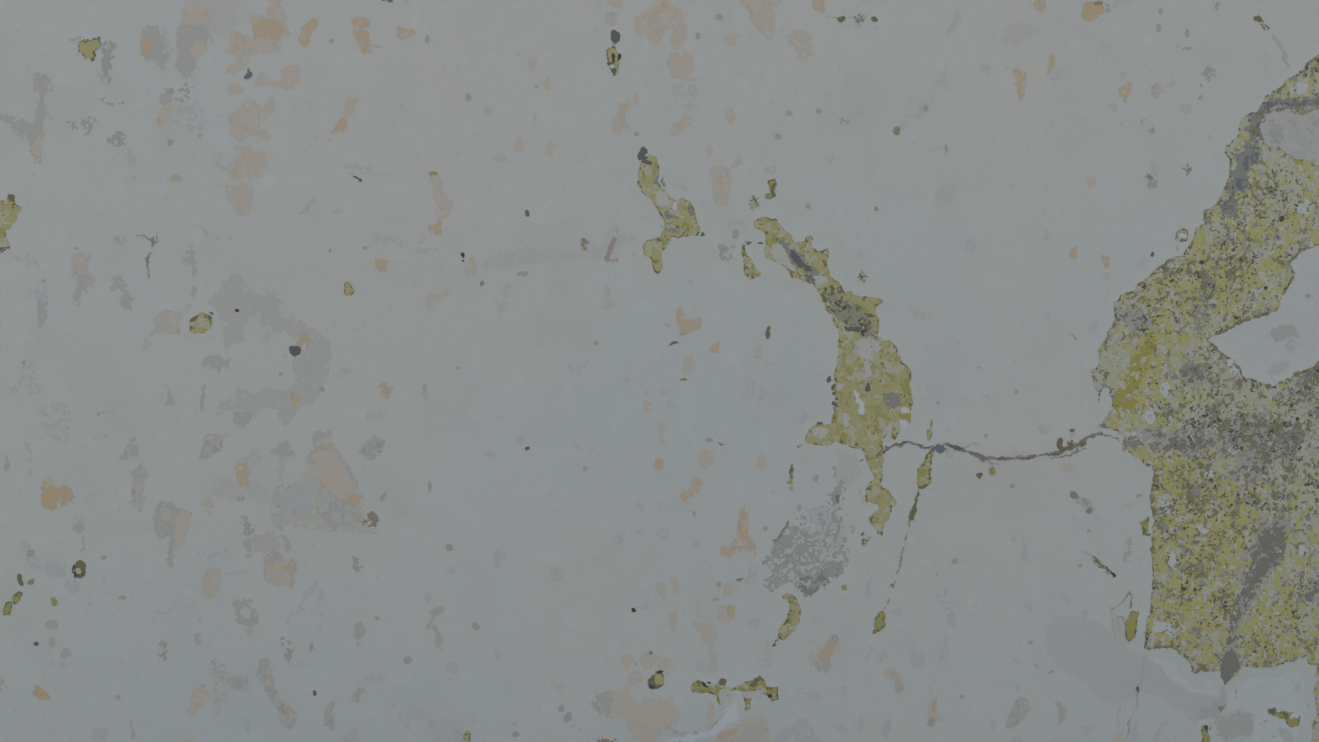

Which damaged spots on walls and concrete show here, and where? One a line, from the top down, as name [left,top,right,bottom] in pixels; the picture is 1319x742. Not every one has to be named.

peeling [0,183,30,265]
peeling [629,145,742,285]
peeling [732,179,941,546]
crack [860,432,1137,465]
peeling [1057,40,1319,742]
crack [885,490,920,608]
peeling [640,651,674,690]
peeling [680,667,786,742]